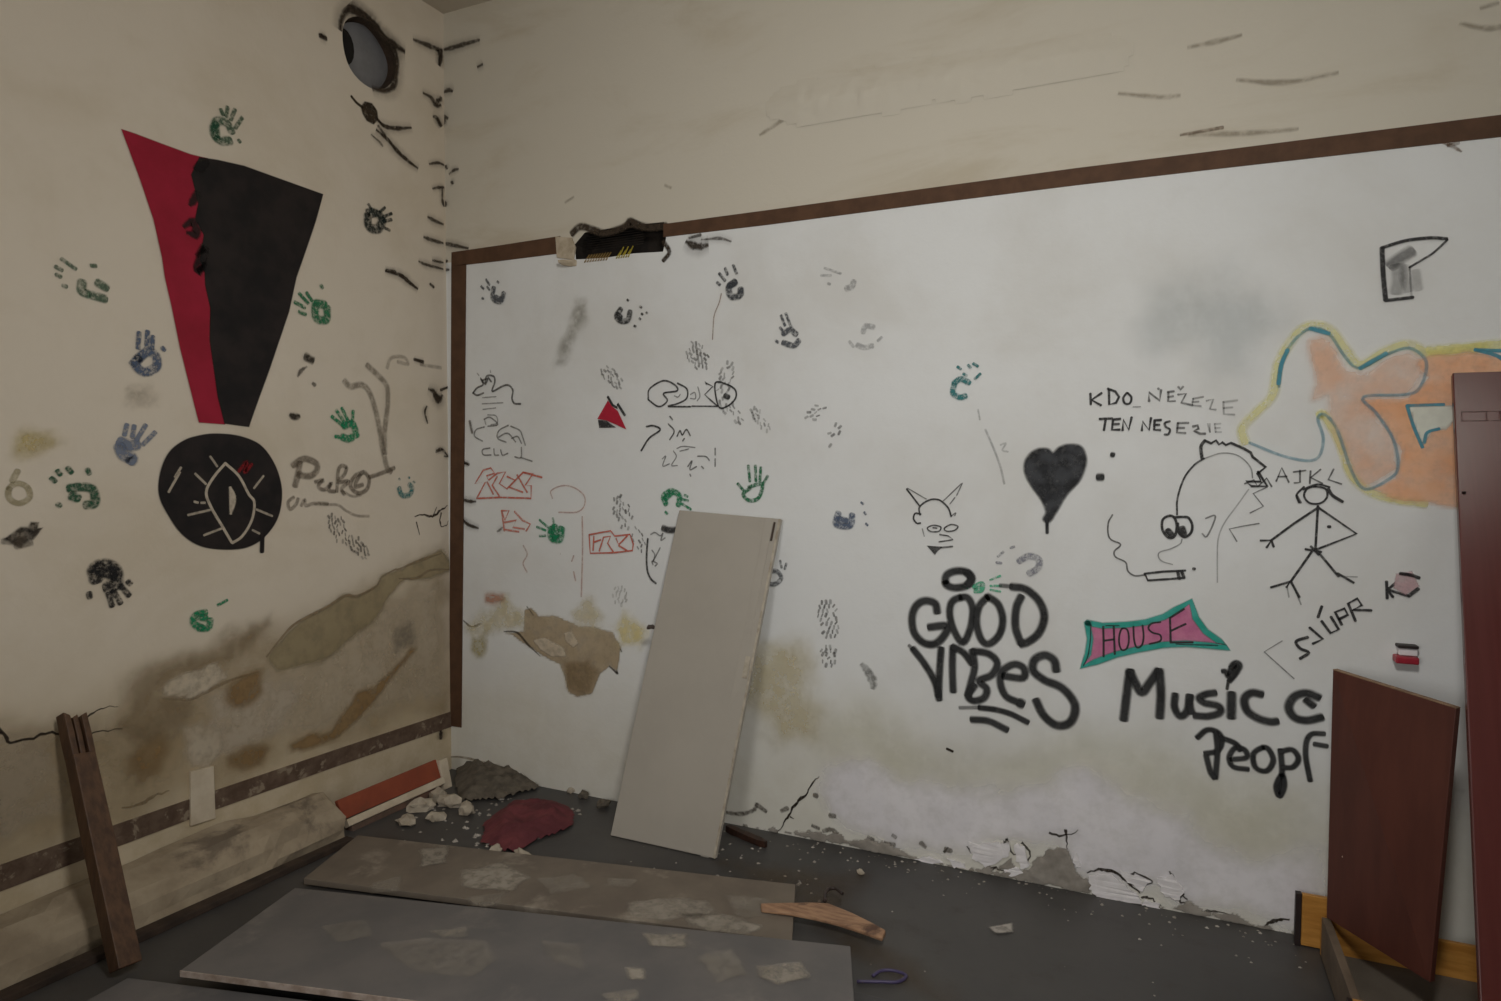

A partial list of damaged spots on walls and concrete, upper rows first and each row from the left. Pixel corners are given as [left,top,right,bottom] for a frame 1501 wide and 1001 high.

spalling [575,222,666,259]
peeling [164,664,226,698]
damp [94,551,450,808]
peeling [504,607,622,696]
crack [0,706,122,744]
damp [0,735,72,817]
flaking render [726,803,1294,935]